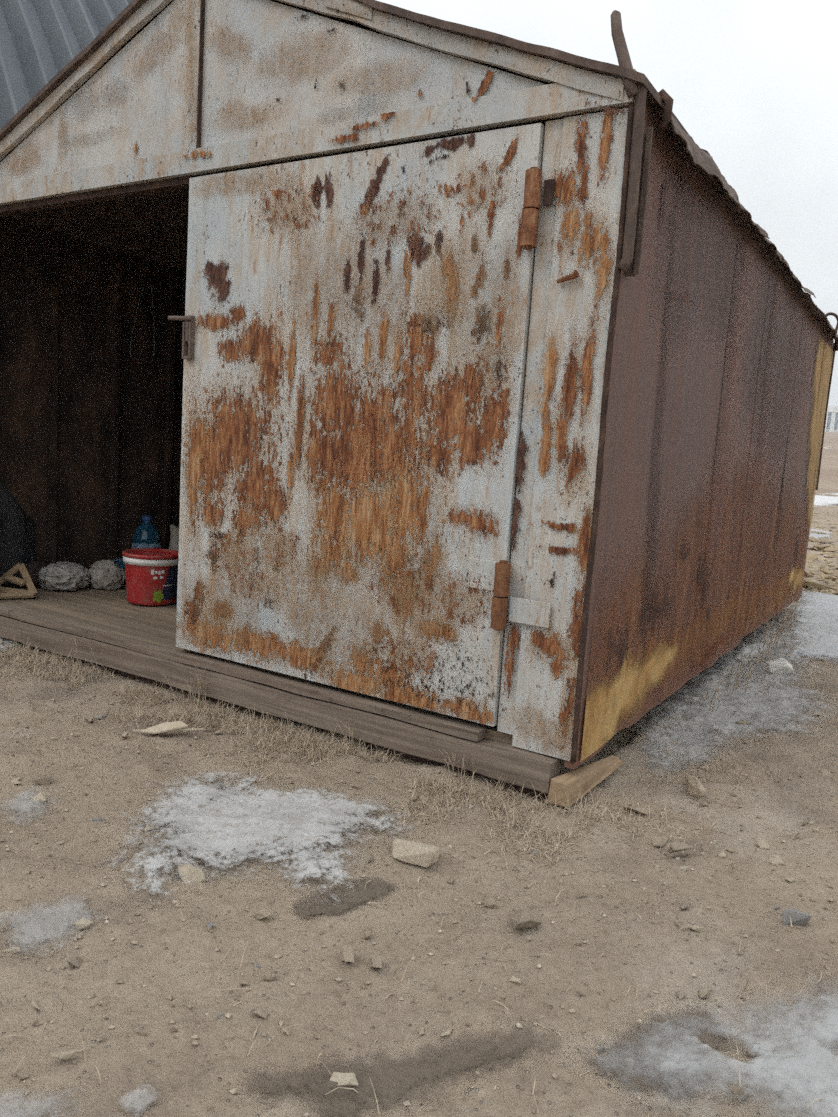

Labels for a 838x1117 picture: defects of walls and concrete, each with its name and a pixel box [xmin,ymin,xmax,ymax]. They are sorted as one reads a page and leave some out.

rust [471,70,494,103]
rust [176,98,625,745]